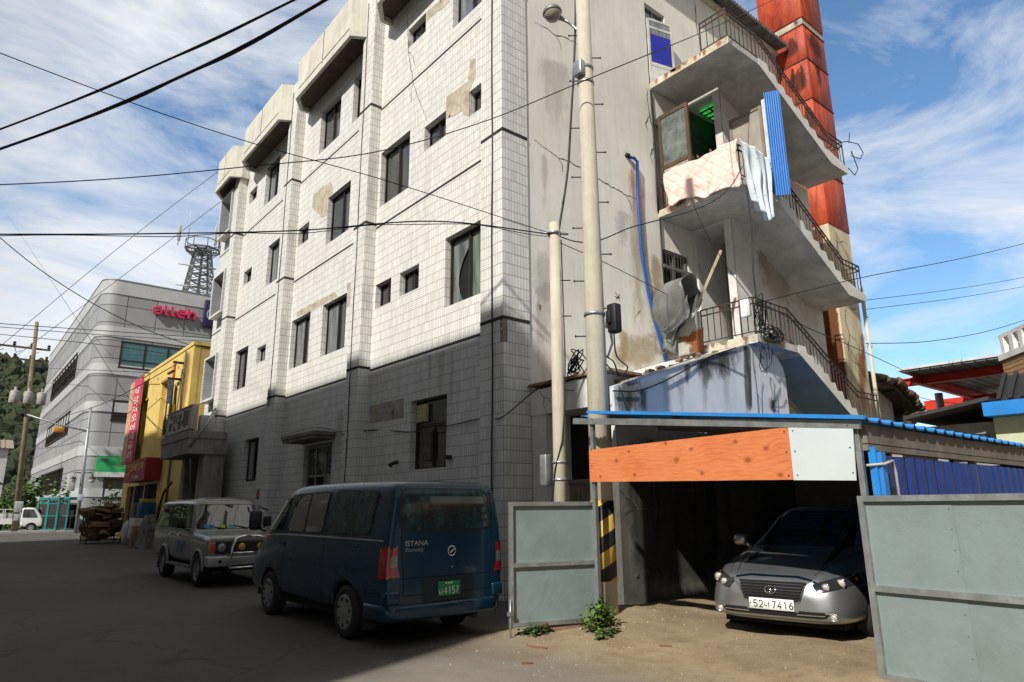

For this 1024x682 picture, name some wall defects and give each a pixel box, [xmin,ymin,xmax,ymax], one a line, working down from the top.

peeling [446,58,475,119]
peeling [312,181,333,223]
crack [536,140,645,210]
rust [679,327,704,356]